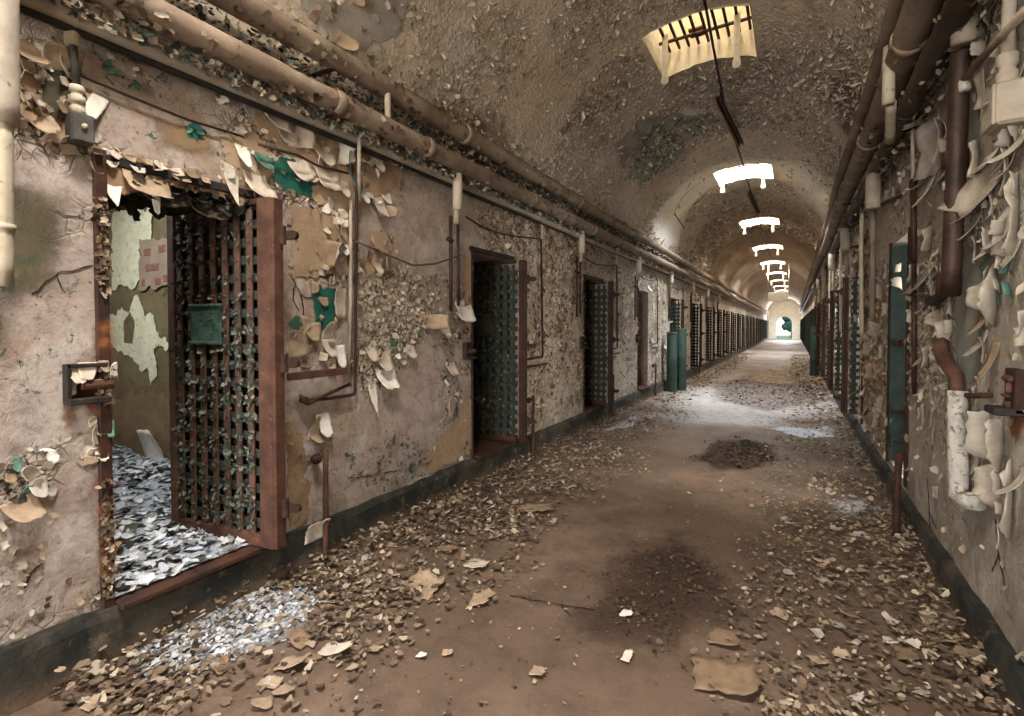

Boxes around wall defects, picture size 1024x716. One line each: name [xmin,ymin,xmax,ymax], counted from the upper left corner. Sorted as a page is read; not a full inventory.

peeling [84,90,109,119]
peeling [1007,305,1024,360]
peeling [930,466,988,554]